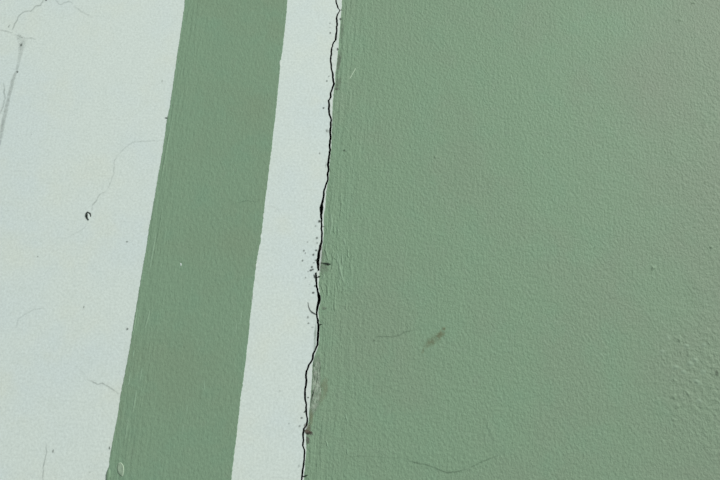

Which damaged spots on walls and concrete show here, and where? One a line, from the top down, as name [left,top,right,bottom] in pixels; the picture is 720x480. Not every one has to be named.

crack [301,0,340,480]